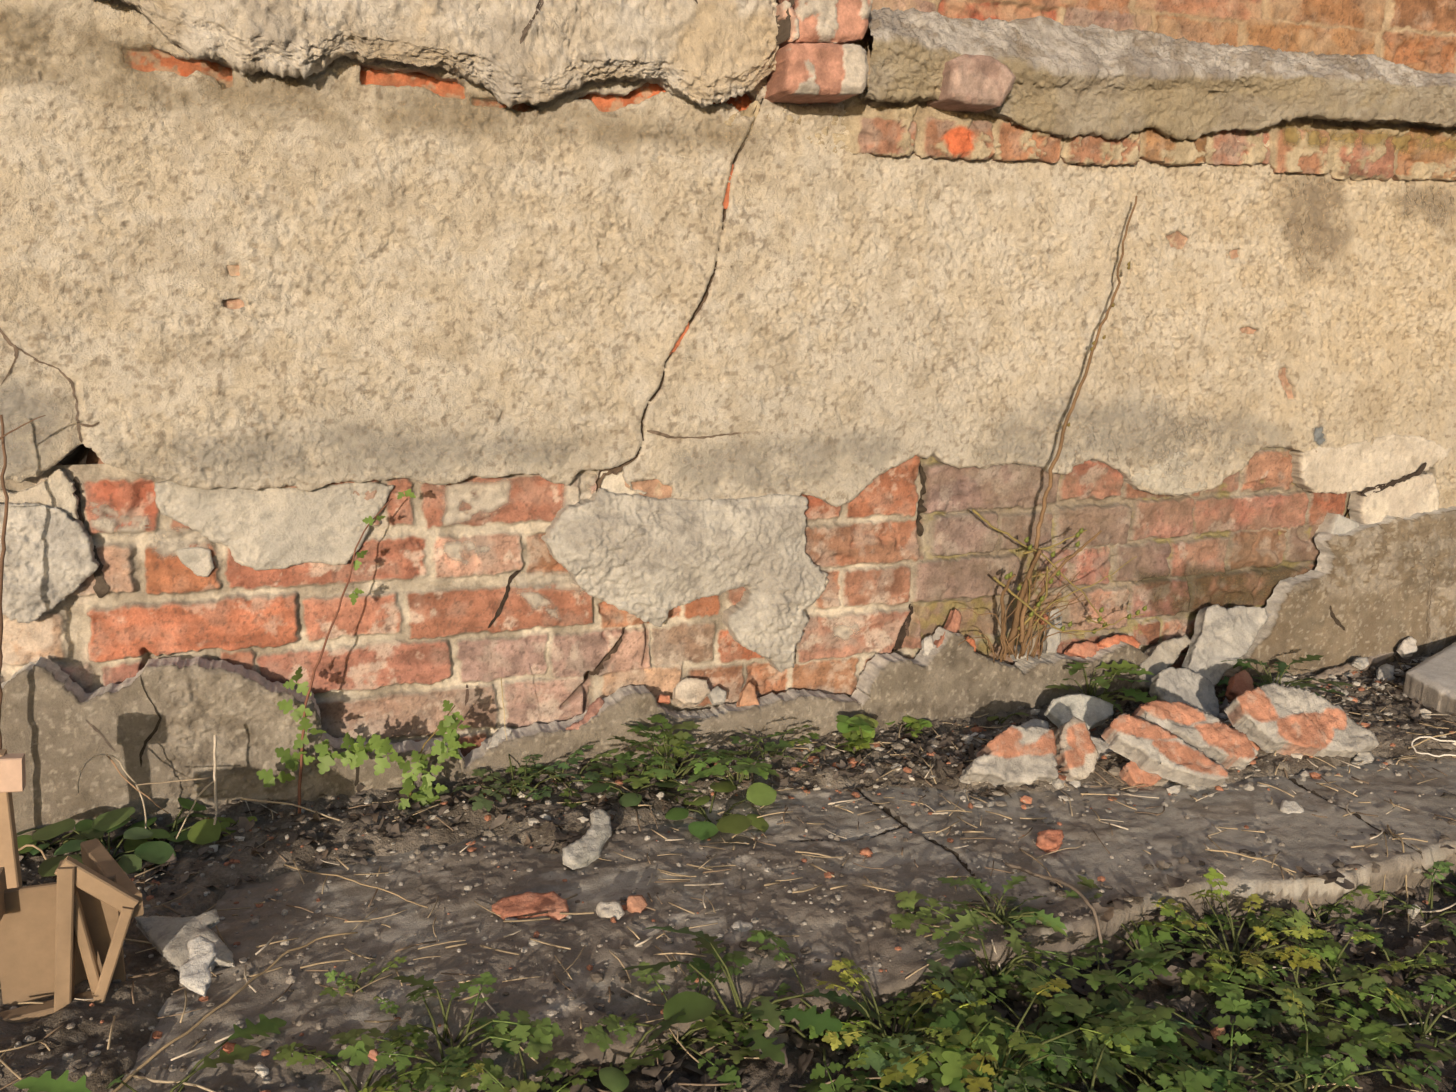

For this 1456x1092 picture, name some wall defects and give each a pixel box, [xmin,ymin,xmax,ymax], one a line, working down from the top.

spalling [121,46,233,88]
spalling [360,66,535,112]
crack [596,102,762,493]
crack [0,329,110,598]
crack [1361,462,1427,497]
spalling [0,434,1451,757]
crack [588,627,625,676]
crack [86,674,161,766]